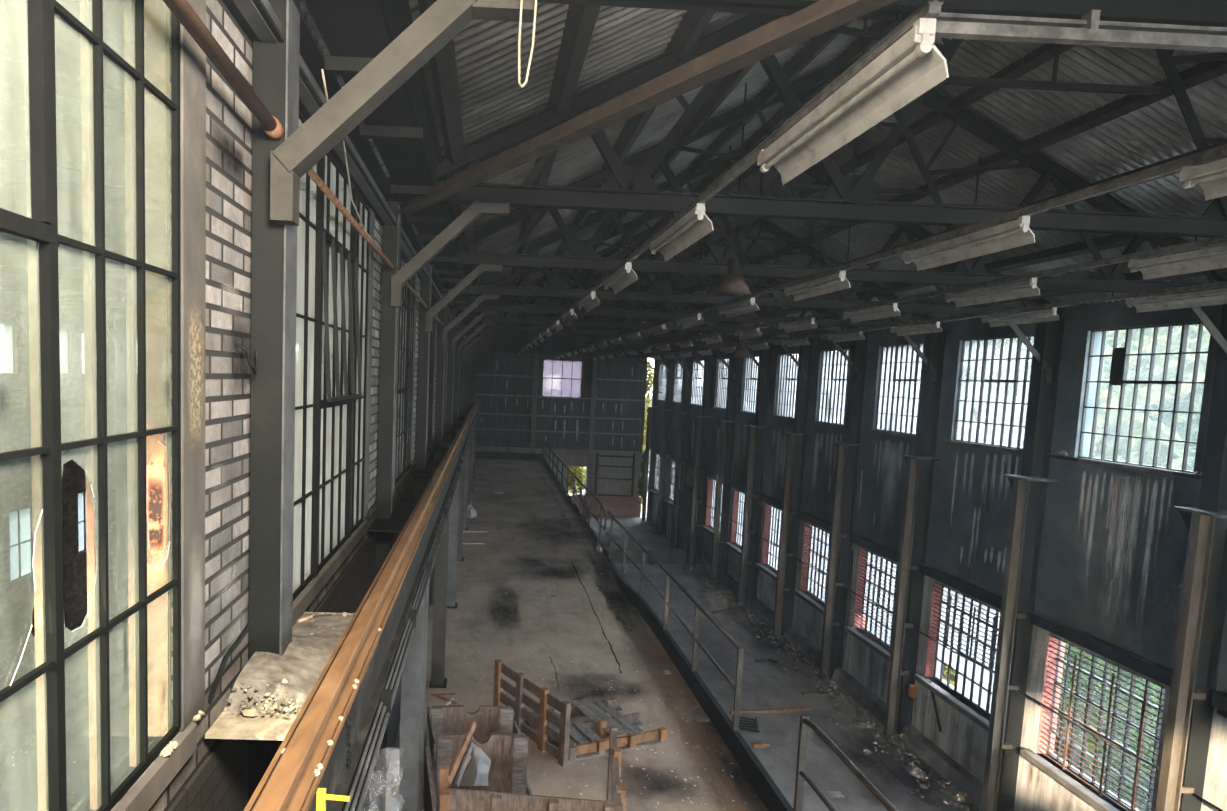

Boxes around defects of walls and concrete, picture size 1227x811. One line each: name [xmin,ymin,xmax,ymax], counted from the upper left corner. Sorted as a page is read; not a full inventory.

damp [1079,473,1172,606]
crack [571,562,622,673]